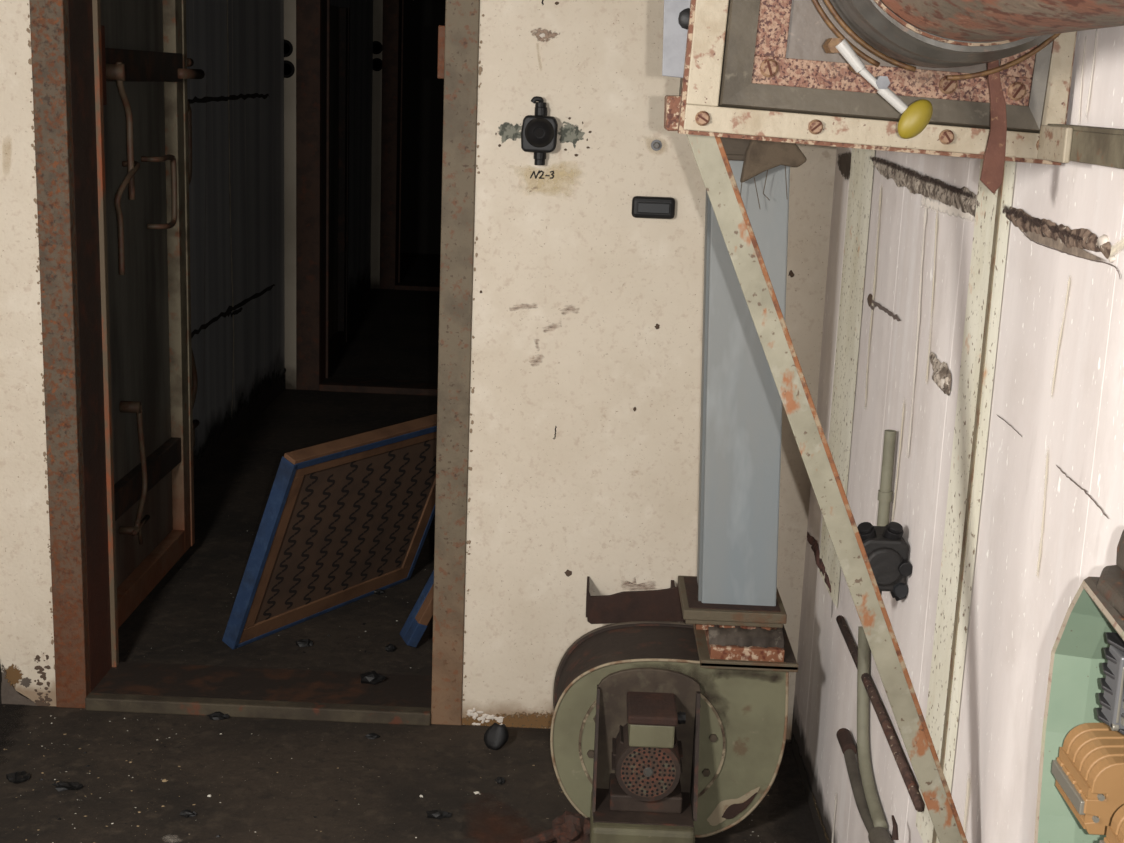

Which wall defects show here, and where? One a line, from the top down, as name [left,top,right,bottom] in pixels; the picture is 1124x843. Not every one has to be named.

crack [188,93,269,104]
crack [191,284,275,339]
damp [0,663,23,687]
peeling [1,637,55,706]